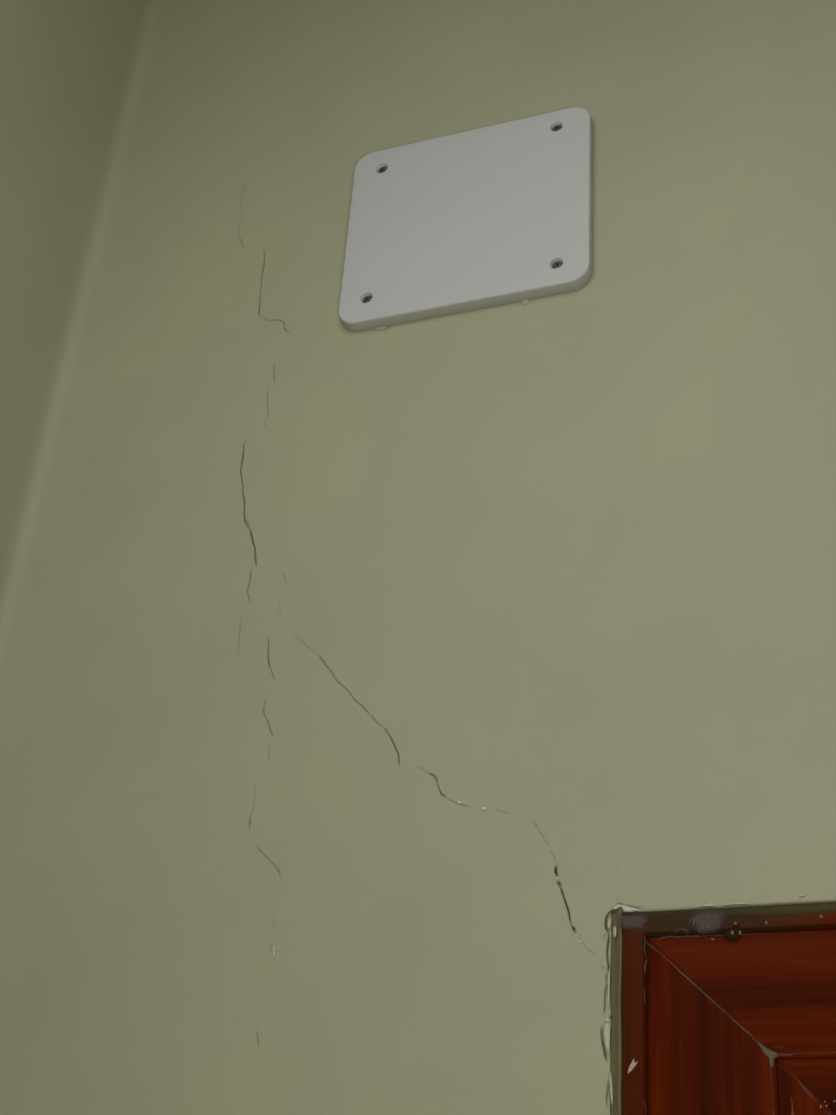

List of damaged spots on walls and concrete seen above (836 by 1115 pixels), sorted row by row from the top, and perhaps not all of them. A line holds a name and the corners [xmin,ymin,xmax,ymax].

crack [554,867,620,1057]